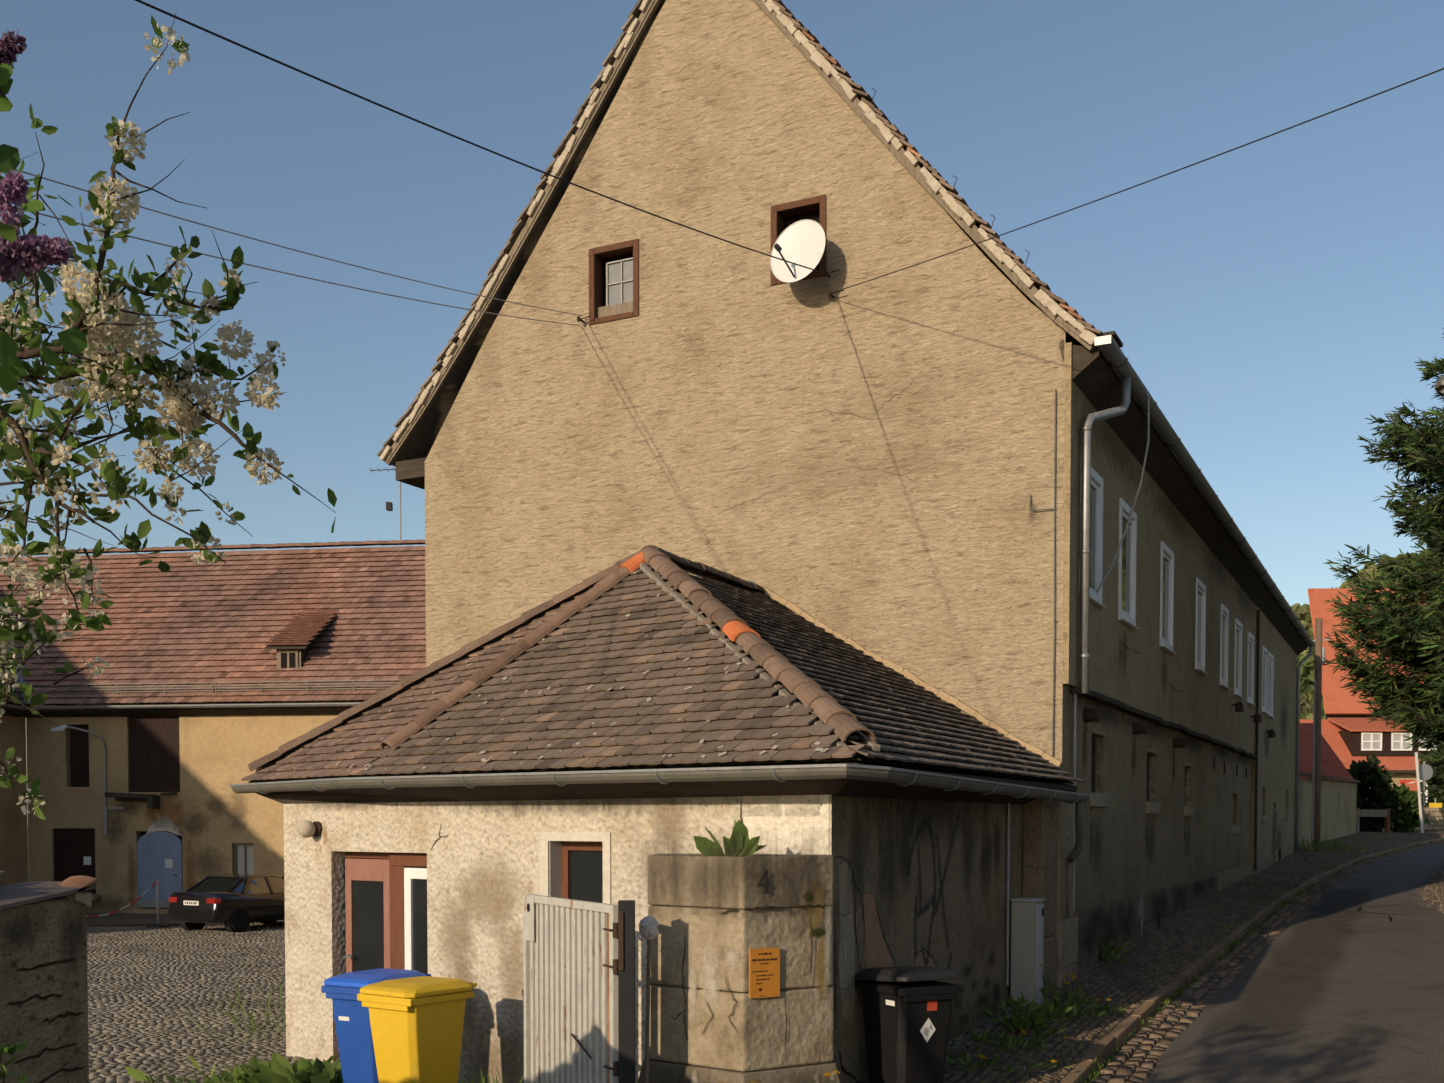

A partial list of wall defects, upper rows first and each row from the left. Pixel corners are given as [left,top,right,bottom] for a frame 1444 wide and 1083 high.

crack [671,945,738,1040]
spalling [745,861,896,1026]
crack [834,856,867,1006]